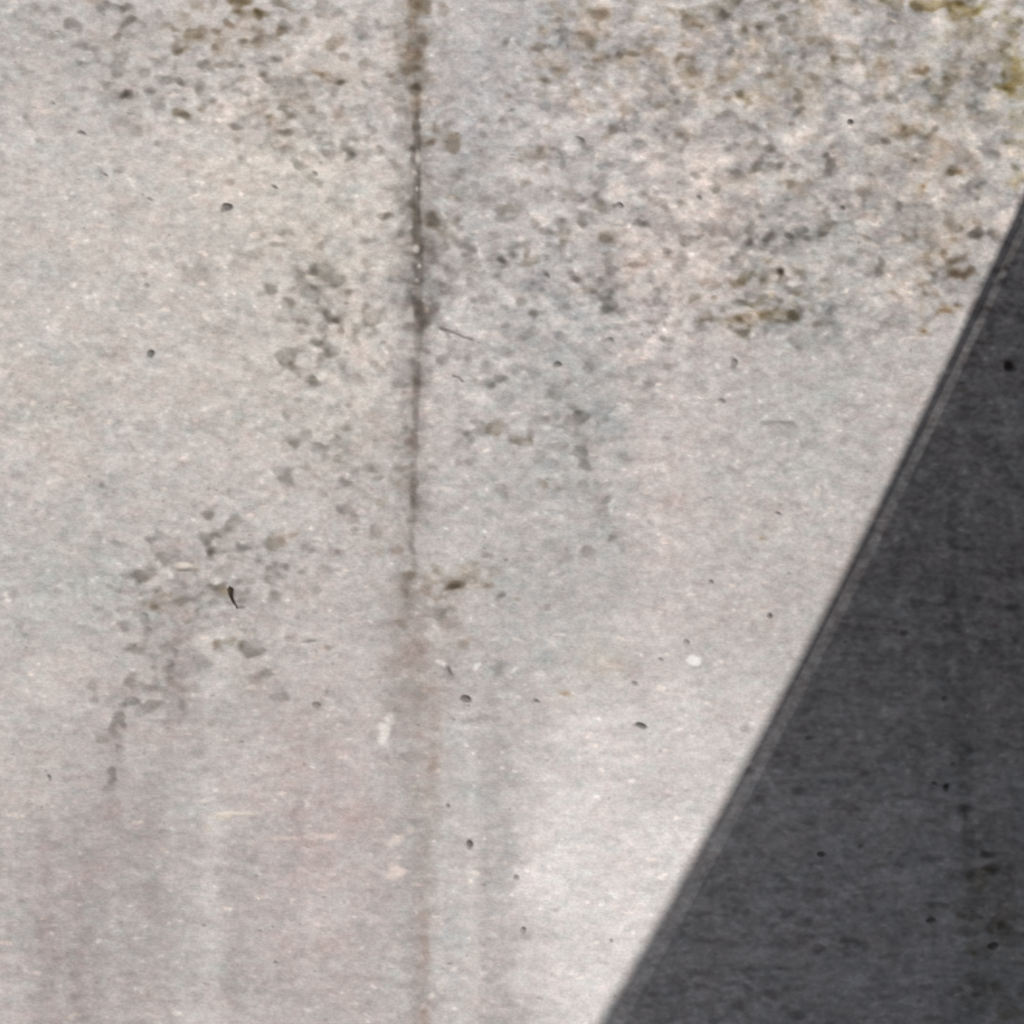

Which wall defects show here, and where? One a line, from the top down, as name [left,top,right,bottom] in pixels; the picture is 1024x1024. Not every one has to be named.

crack [369,0,474,668]